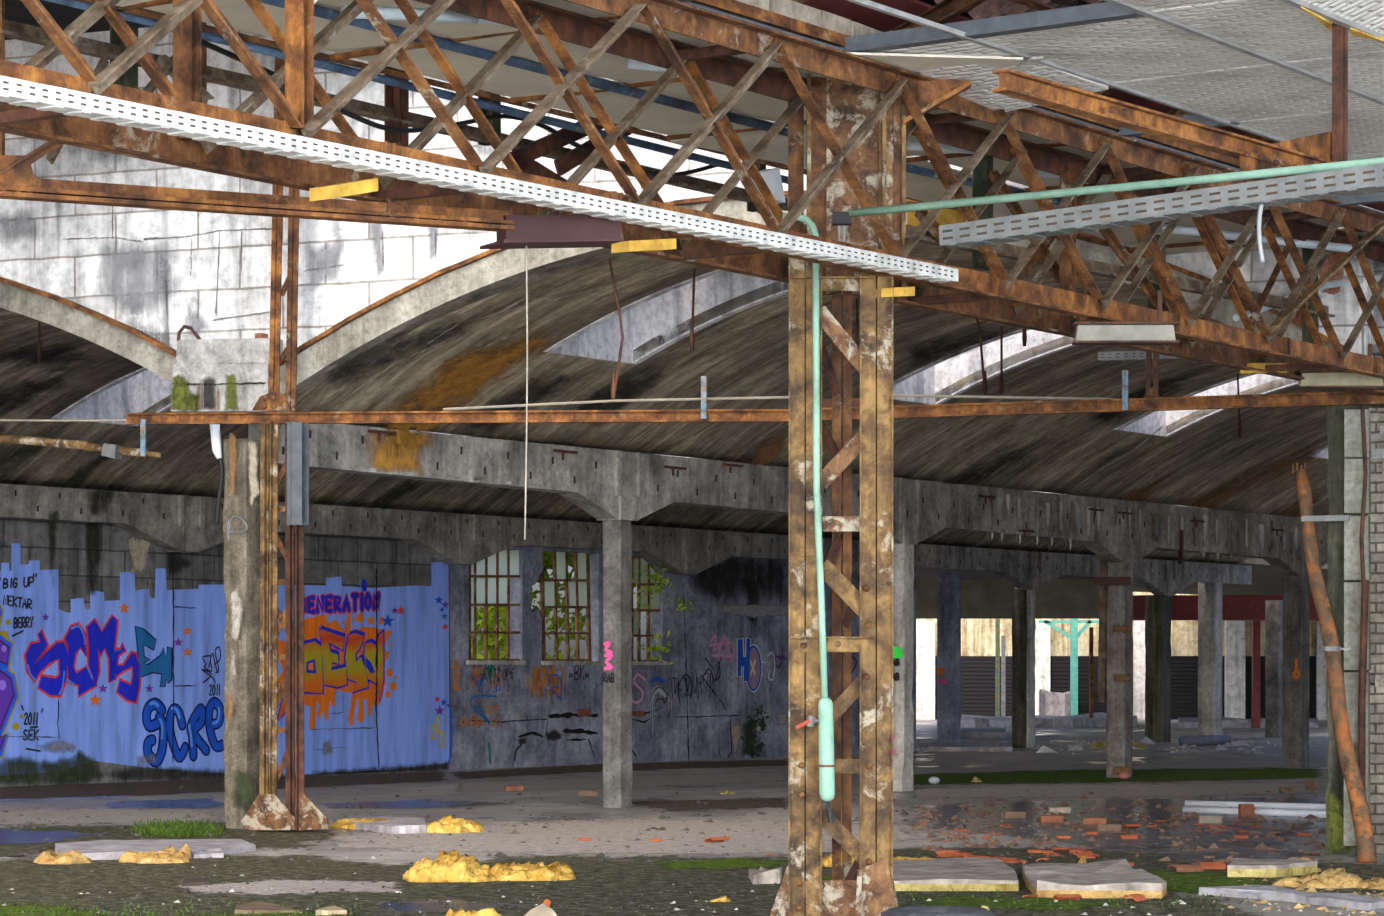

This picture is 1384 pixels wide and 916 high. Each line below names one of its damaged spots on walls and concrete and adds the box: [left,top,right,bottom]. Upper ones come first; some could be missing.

water stain [0,214,34,239]
water stain [313,244,340,282]
water stain [373,224,383,274]
water stain [108,246,171,345]
water stain [189,312,205,334]
corrosion [372,337,547,474]